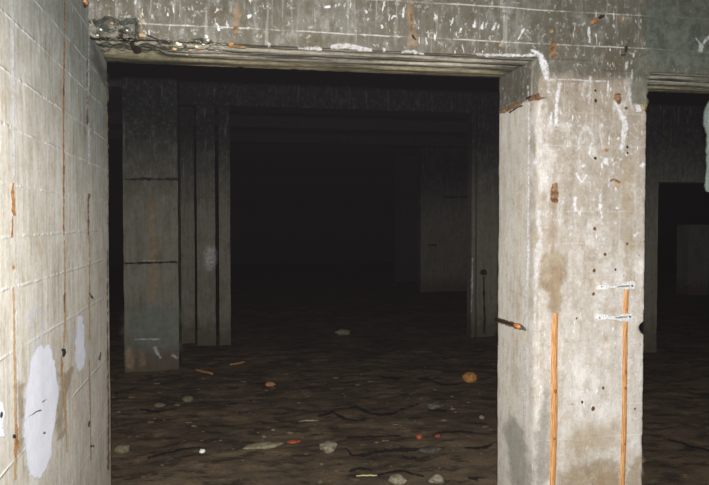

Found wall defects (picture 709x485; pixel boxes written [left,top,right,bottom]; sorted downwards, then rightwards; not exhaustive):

spalling [158,38,213,56]
rust [550,183,559,203]